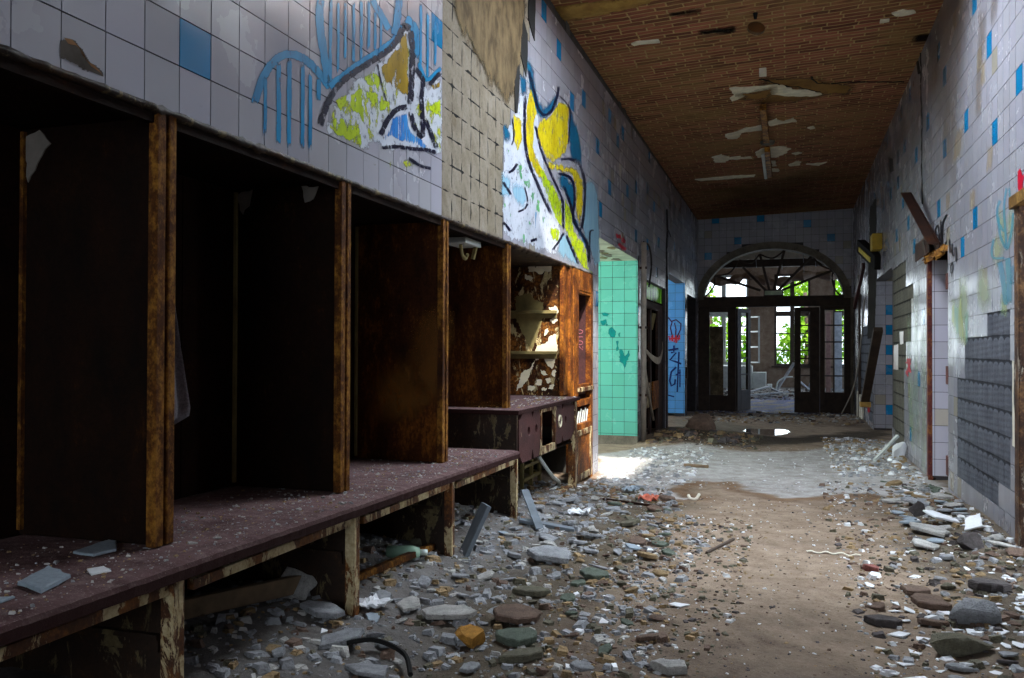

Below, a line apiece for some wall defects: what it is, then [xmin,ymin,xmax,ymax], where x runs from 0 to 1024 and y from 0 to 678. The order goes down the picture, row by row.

flaking render [880,9,916,24]
spalling [60,38,103,76]
flaking render [729,84,822,101]
spalling [441,0,530,239]
flaking render [725,118,815,139]
flaking render [712,146,827,172]
peeling [515,266,559,391]